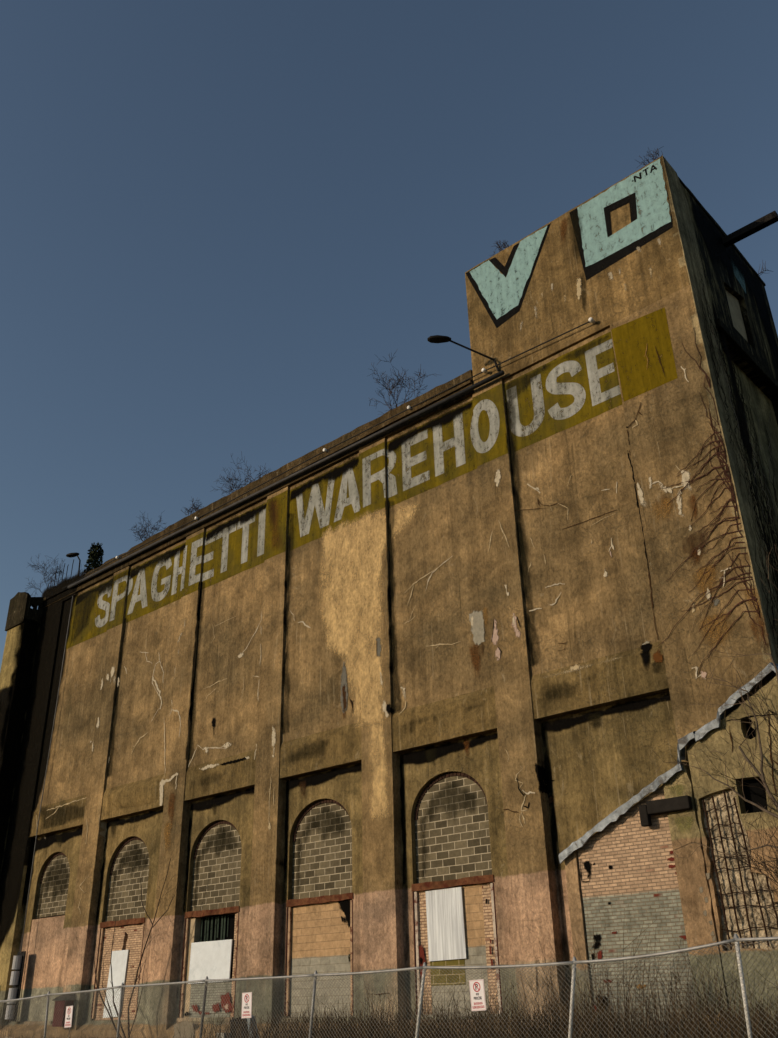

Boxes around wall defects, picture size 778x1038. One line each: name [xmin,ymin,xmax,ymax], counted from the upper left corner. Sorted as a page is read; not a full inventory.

crack [204,611,262,700]
peeling [469,611,502,661]
spalling [640,641,652,667]
crack [124,652,181,754]
crack [503,751,535,827]